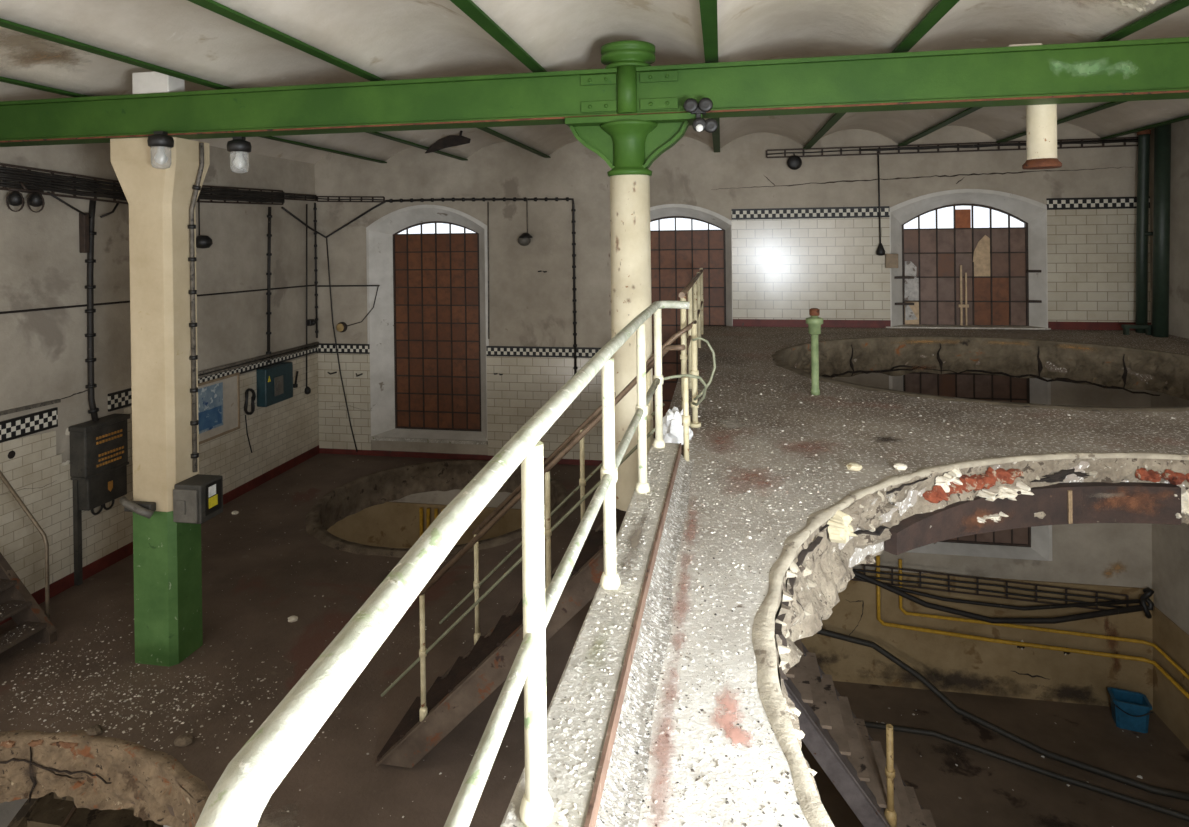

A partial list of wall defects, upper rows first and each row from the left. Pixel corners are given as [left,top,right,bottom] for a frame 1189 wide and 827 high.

water stain [0,35,65,62]
peeling [1053,62,1102,75]
crack [822,344,1160,396]
spalling [827,467,1189,555]
spalling [775,557,817,670]
crack [0,747,112,802]